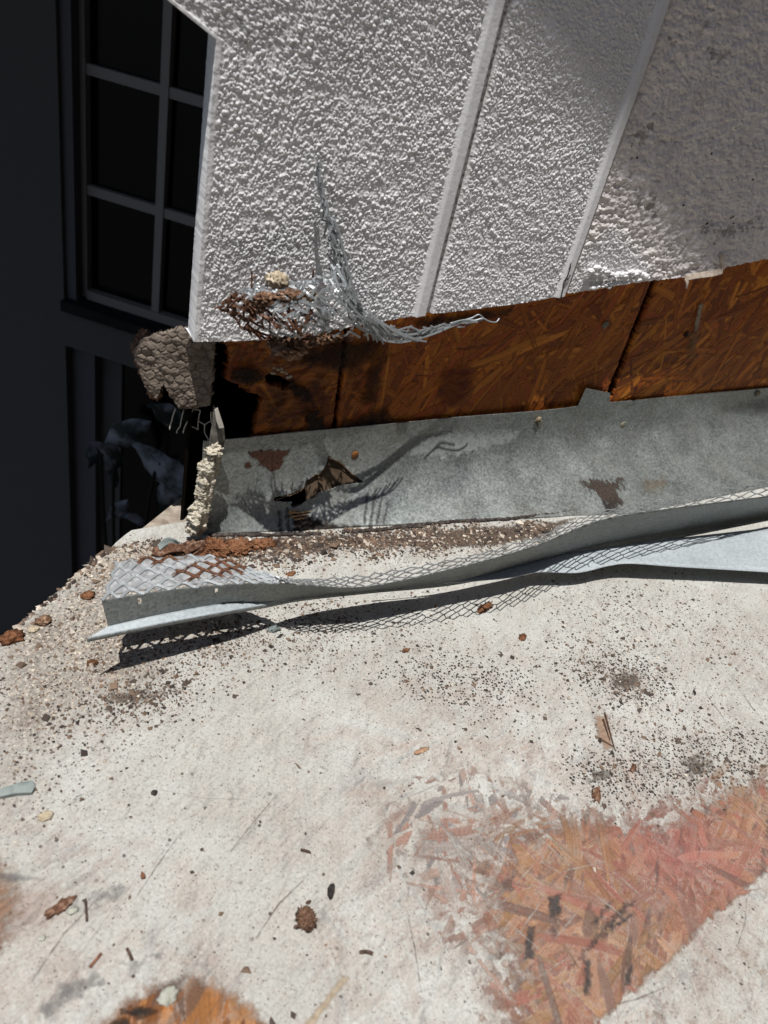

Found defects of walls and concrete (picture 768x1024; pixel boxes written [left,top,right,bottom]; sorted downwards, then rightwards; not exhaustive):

peeling [685,243,725,289]
flaking render [586,264,652,374]
rust [245,449,290,471]
peeling [305,456,363,501]